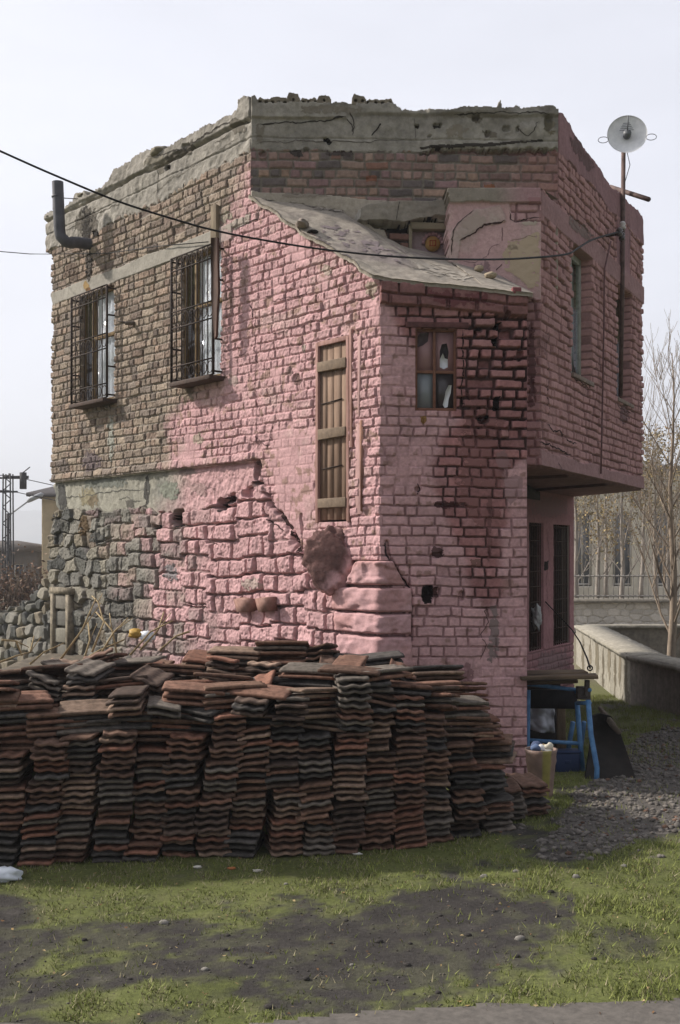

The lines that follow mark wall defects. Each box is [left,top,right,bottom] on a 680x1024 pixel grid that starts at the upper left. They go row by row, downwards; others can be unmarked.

crack [260,113,416,144]
crack [454,111,549,136]
crack [396,211,539,276]
crack [262,502,304,558]
peeling [162,563,178,581]
peeling [241,577,264,592]